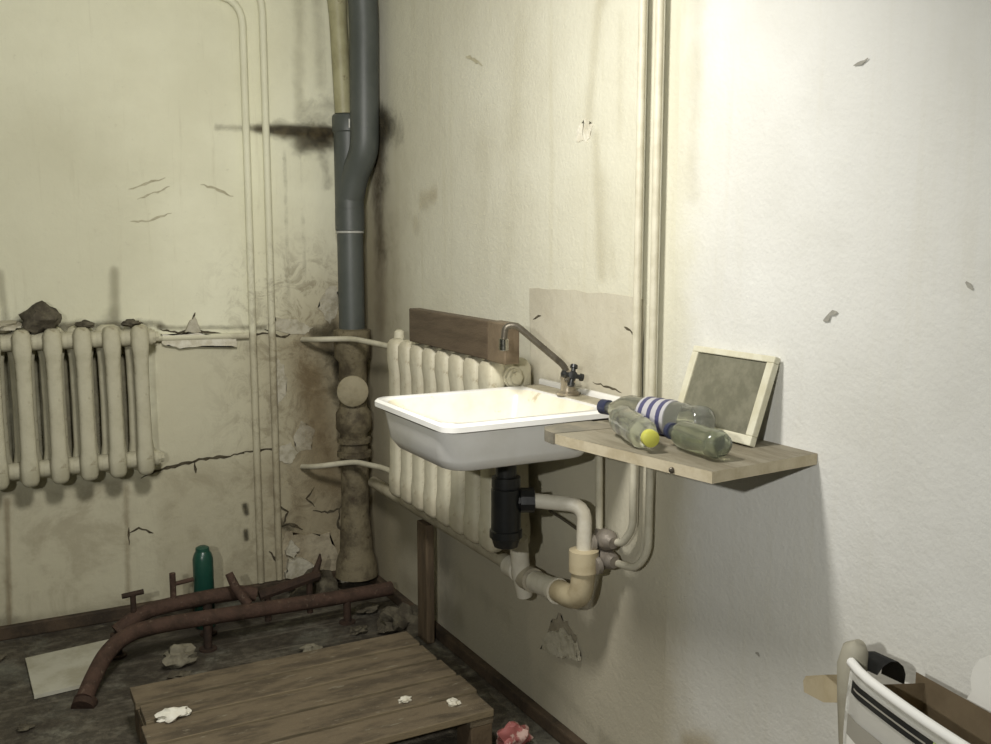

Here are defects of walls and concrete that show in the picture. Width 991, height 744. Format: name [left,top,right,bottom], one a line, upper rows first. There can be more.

damp [254,125,334,138]
damp [375,108,391,165]
damp [313,324,339,396]
crack [142,448,296,478]
flaking render [279,421,315,464]
flaking render [282,531,346,583]